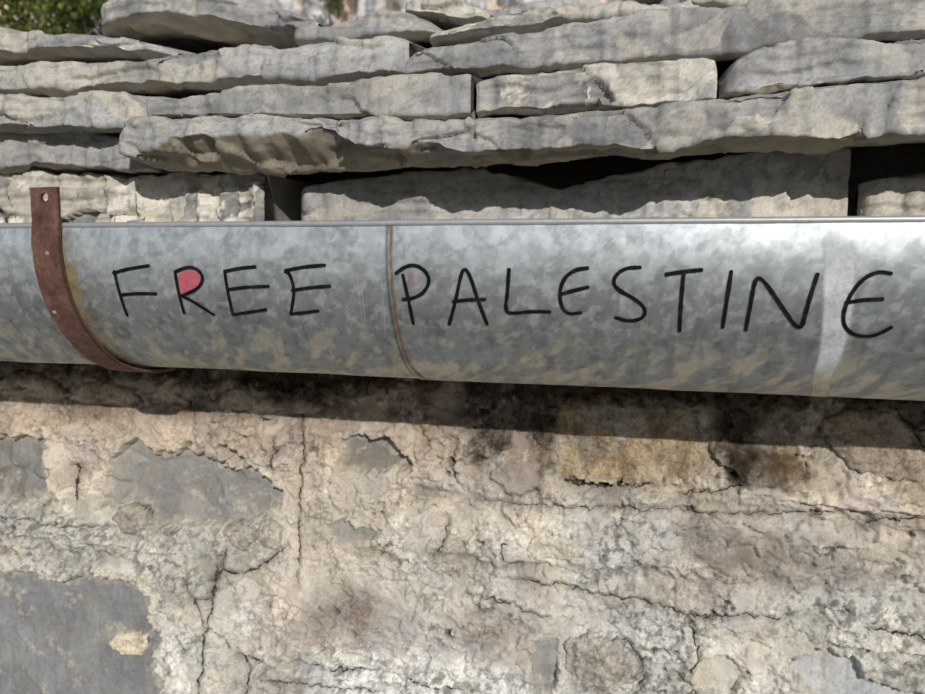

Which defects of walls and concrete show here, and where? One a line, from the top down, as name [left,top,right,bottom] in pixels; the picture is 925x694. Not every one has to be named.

leakage [1,361,401,400]
leakage [413,378,443,391]
leakage [462,246,925,488]
crack [890,405,925,449]
spalling [0,435,50,501]
spalling [110,440,284,529]
crack [474,478,838,515]
crack [865,516,924,524]
crack [186,415,385,694]
spalling [0,568,165,694]
crack [408,677,454,690]
spalling [790,648,921,694]